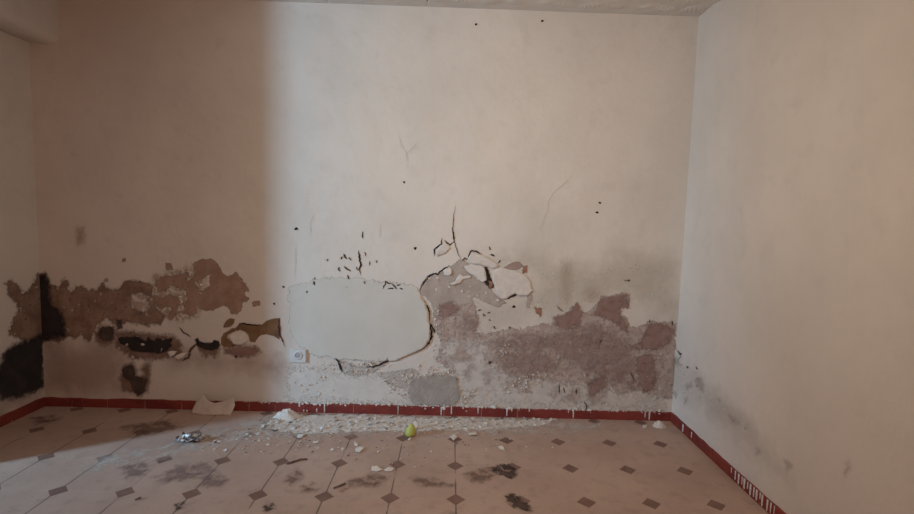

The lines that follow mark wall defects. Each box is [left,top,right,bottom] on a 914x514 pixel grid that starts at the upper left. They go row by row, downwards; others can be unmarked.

crack [434,211,501,263]
peeling [4,273,42,341]
leakage [0,273,165,400]
peeling [116,259,284,361]
peeling [420,253,533,329]